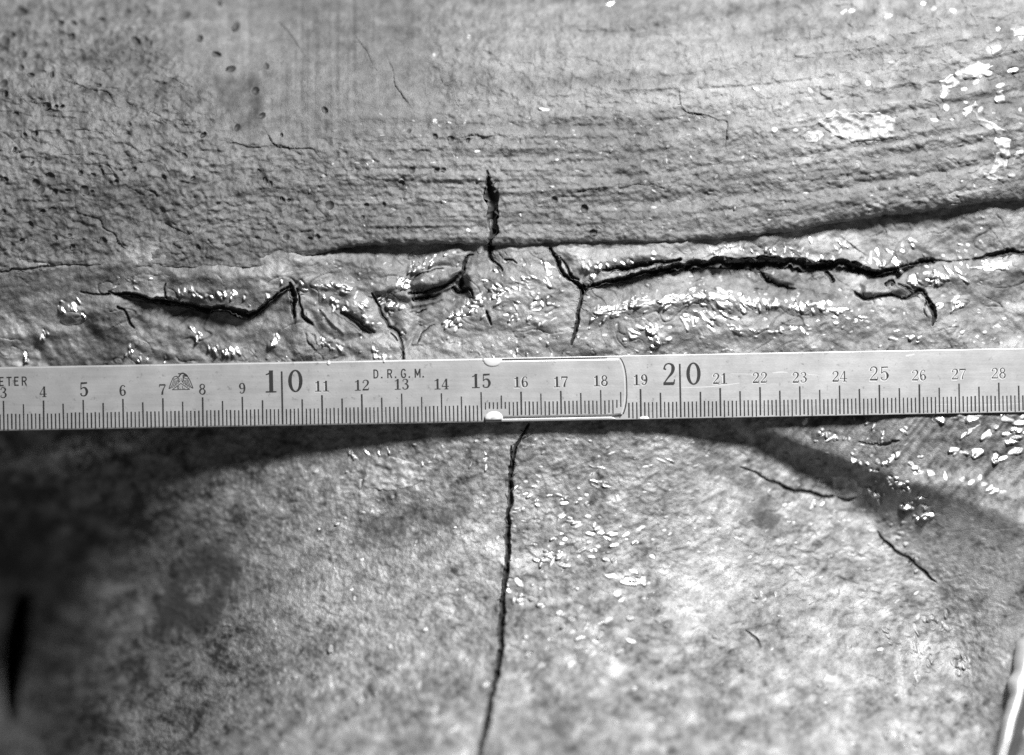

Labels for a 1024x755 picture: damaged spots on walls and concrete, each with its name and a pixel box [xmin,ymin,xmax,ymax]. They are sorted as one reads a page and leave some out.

crack [344,64,521,360]
crack [80,283,317,351]
crack [549,246,1024,357]
crack [740,467,856,502]
crack [478,424,533,755]
crack [877,531,936,583]